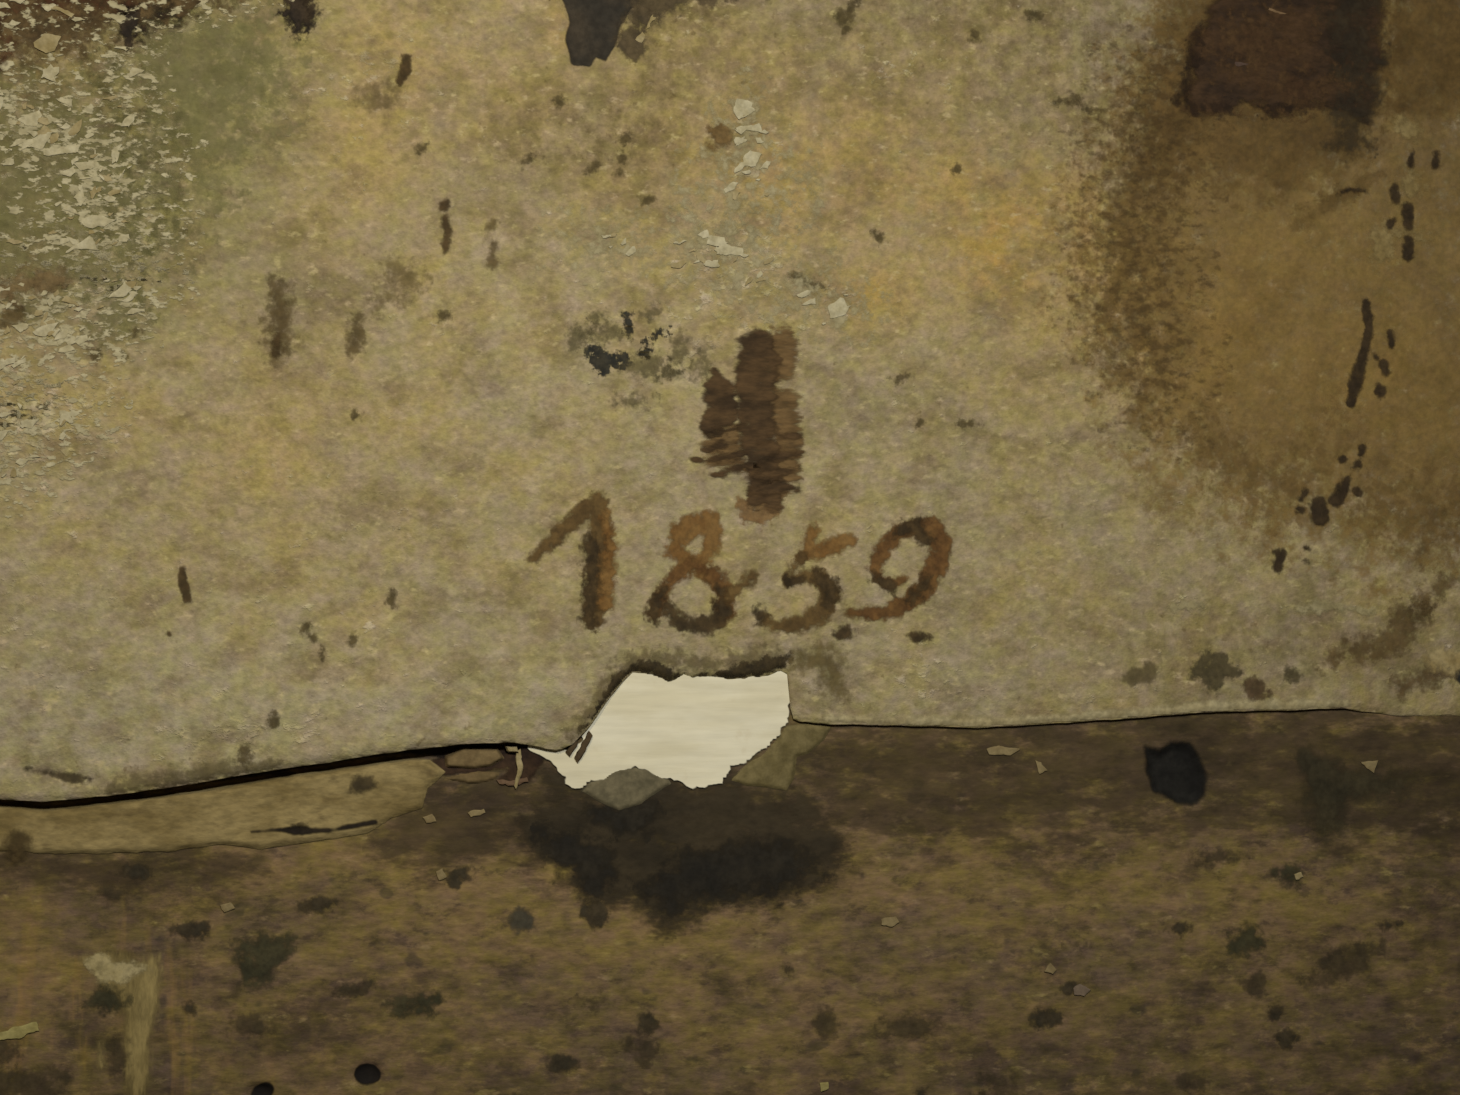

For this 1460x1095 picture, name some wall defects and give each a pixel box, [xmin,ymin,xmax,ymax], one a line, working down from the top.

peeling [0,0,320,518]
leakage [1089,0,1460,572]
crack [25,743,504,802]
spalling [0,655,1350,854]
leakage [580,902,608,927]